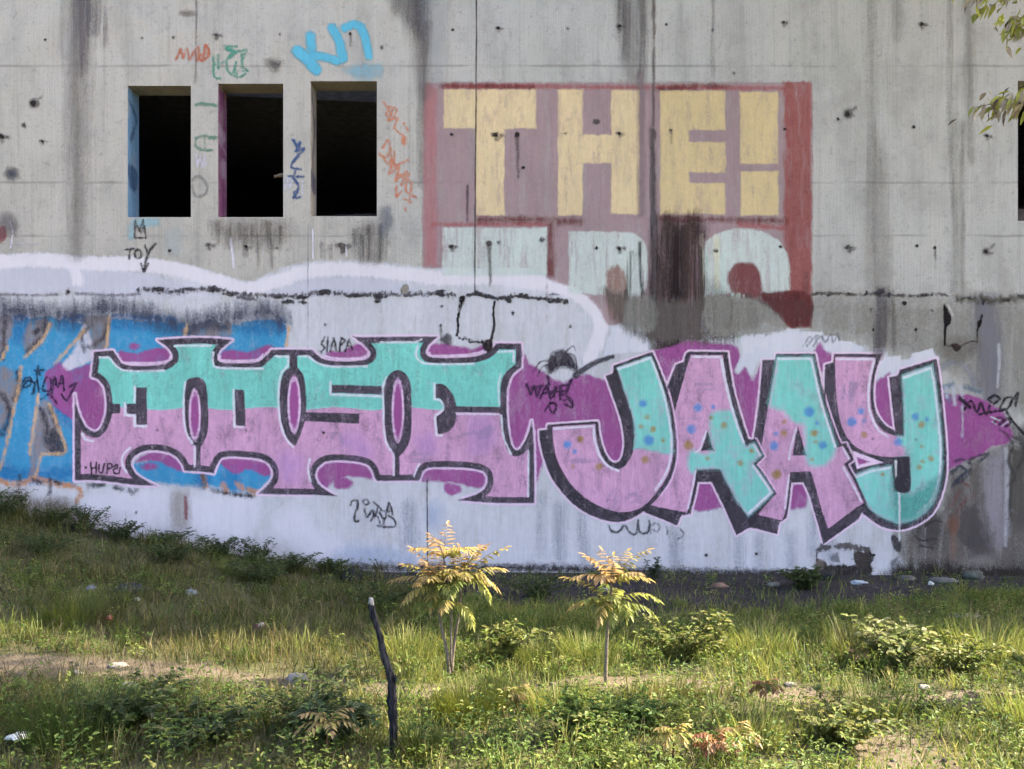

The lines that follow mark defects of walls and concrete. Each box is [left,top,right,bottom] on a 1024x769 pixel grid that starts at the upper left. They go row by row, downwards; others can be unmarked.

damp [608,0,658,88]
damp [60,0,109,265]
damp [207,214,298,268]
damp [348,206,394,268]
damp [945,0,1010,405]
damp [599,208,814,364]
peeling [814,542,874,575]